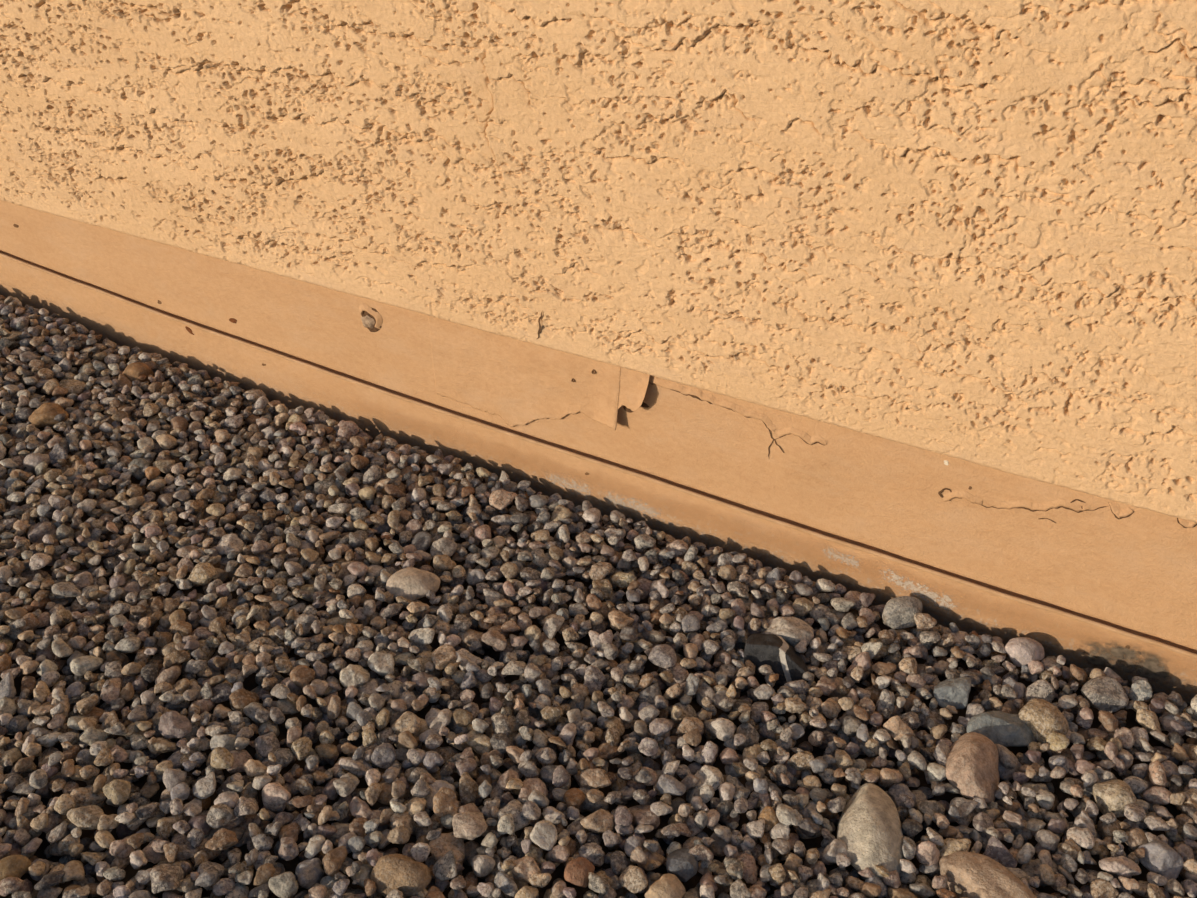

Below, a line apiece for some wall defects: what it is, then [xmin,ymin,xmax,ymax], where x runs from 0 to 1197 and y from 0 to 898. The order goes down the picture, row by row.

peeling [428,316,650,431]
crack [649,376,828,460]
crack [938,488,1134,523]
crack [1177,518,1197,528]